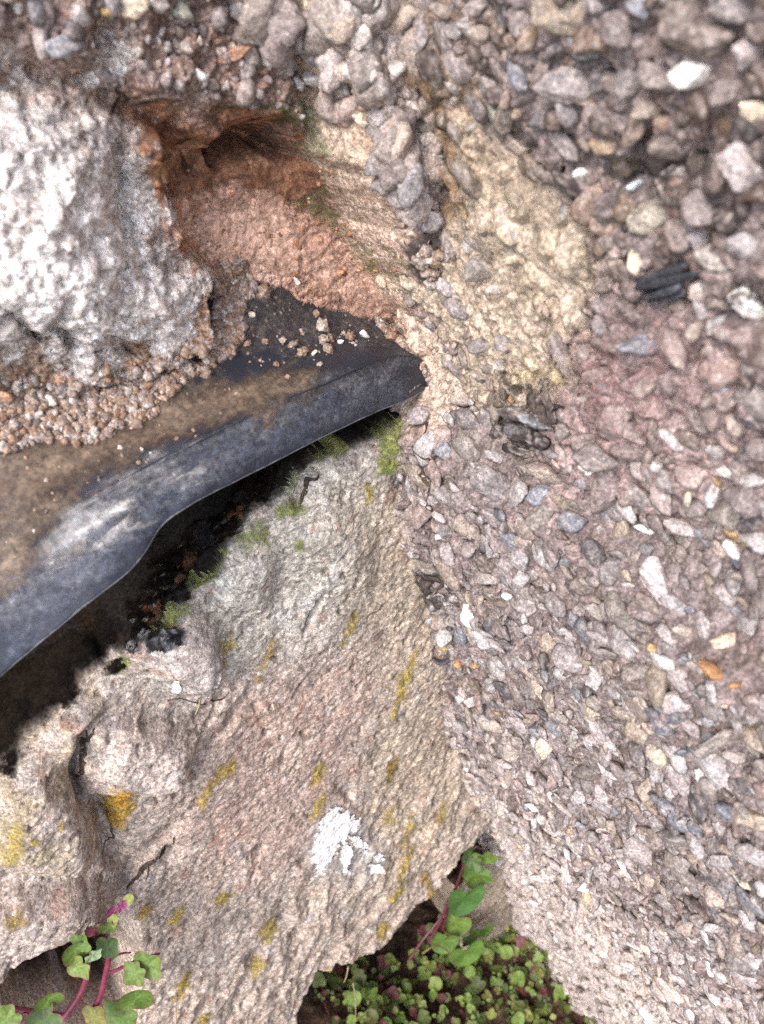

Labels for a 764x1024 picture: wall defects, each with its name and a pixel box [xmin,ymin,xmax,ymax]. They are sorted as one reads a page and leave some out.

corrosion [148,178,404,321]
crack [126,837,175,890]